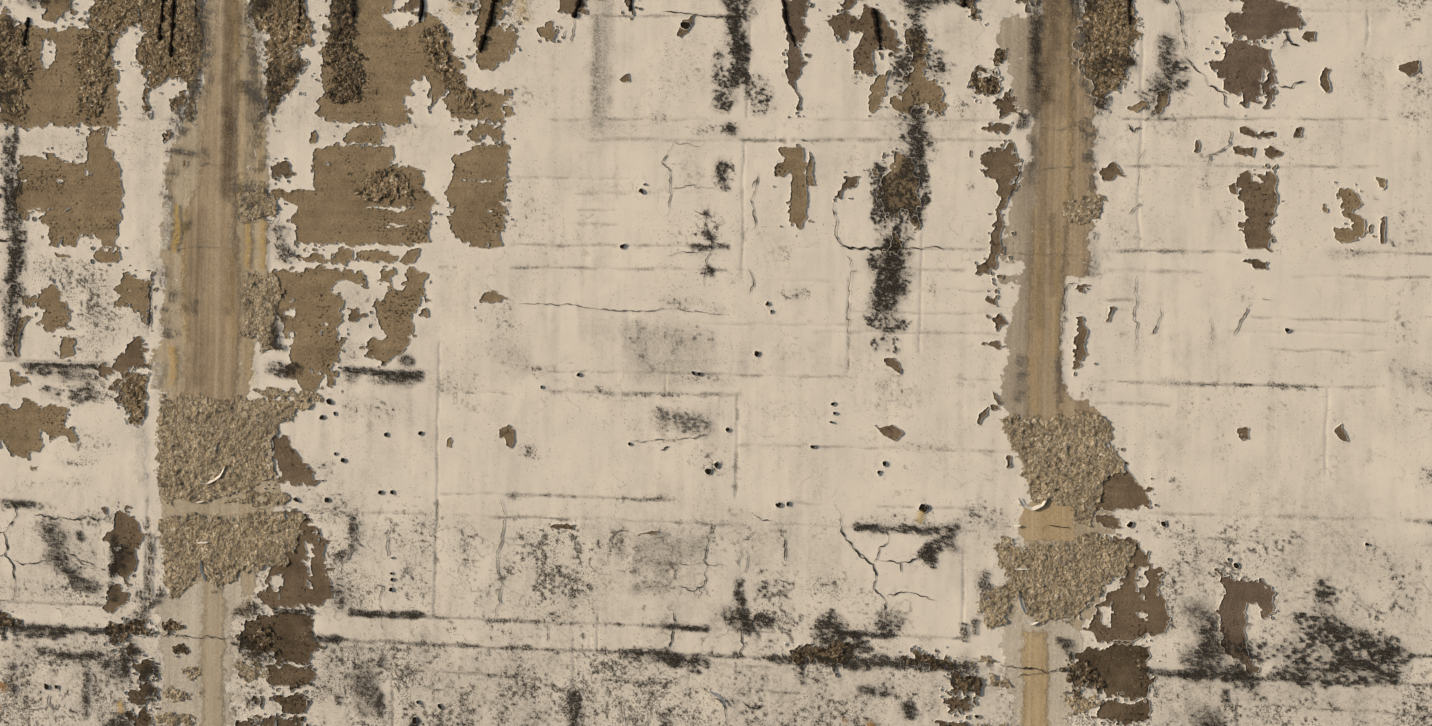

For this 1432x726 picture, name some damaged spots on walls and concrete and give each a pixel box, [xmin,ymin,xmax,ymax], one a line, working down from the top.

peeling [781,0,949,118]
leakage [0,49,102,404]
peeling [772,139,816,236]
leakage [863,0,966,353]
peeling [1204,0,1316,270]
peeling [1321,176,1387,251]
peeling [0,0,602,726]
peeling [898,0,1171,726]
crack [0,504,108,599]
crack [835,505,931,632]
peeling [1209,557,1278,676]
leakage [1143,579,1412,726]